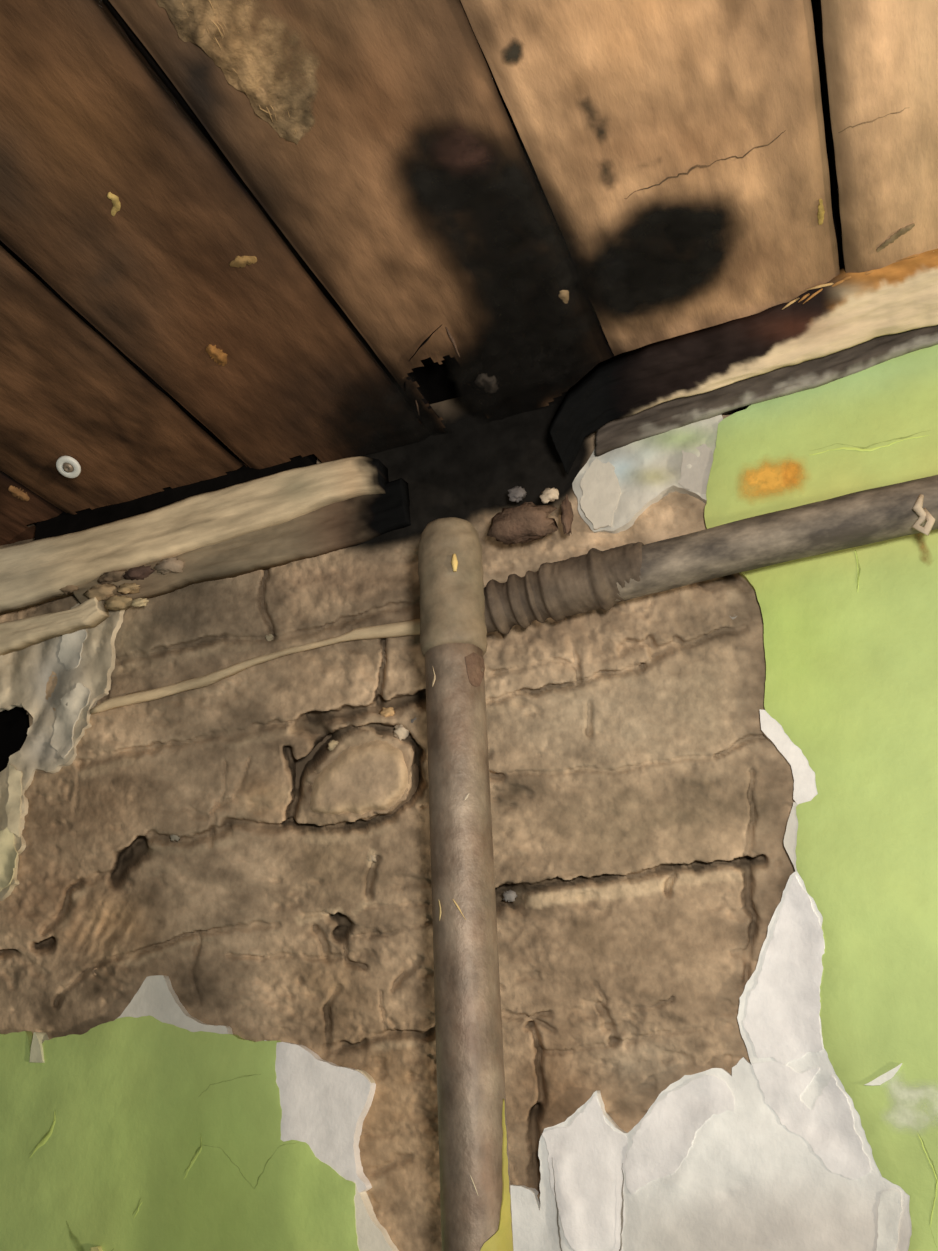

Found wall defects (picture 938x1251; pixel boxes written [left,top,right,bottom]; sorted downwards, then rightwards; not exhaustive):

crack [624,130,786,199]
corrosion [744,462,804,496]
spalling [0,537,442,1251]
spalling [483,573,912,1251]